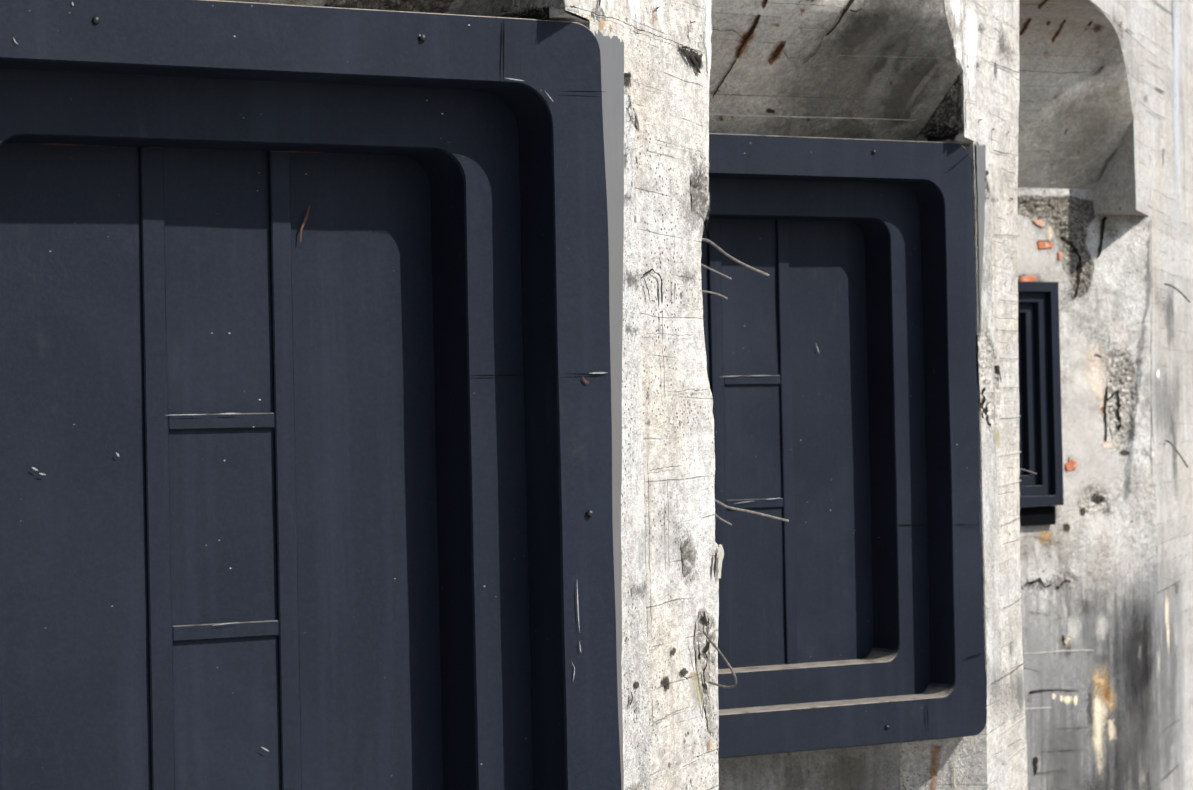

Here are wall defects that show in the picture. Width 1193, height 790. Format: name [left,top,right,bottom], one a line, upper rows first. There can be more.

spalling [323,0,455,14]
corrosion [769,40,795,65]
spalling [917,75,964,142]
spalling [984,170,1095,312]
crack [1097,217,1119,258]
spalling [1083,329,1139,456]
crack [1147,219,1155,475]
spalling [1079,483,1113,516]
spalling [663,609,717,736]
leakage [1021,572,1184,790]